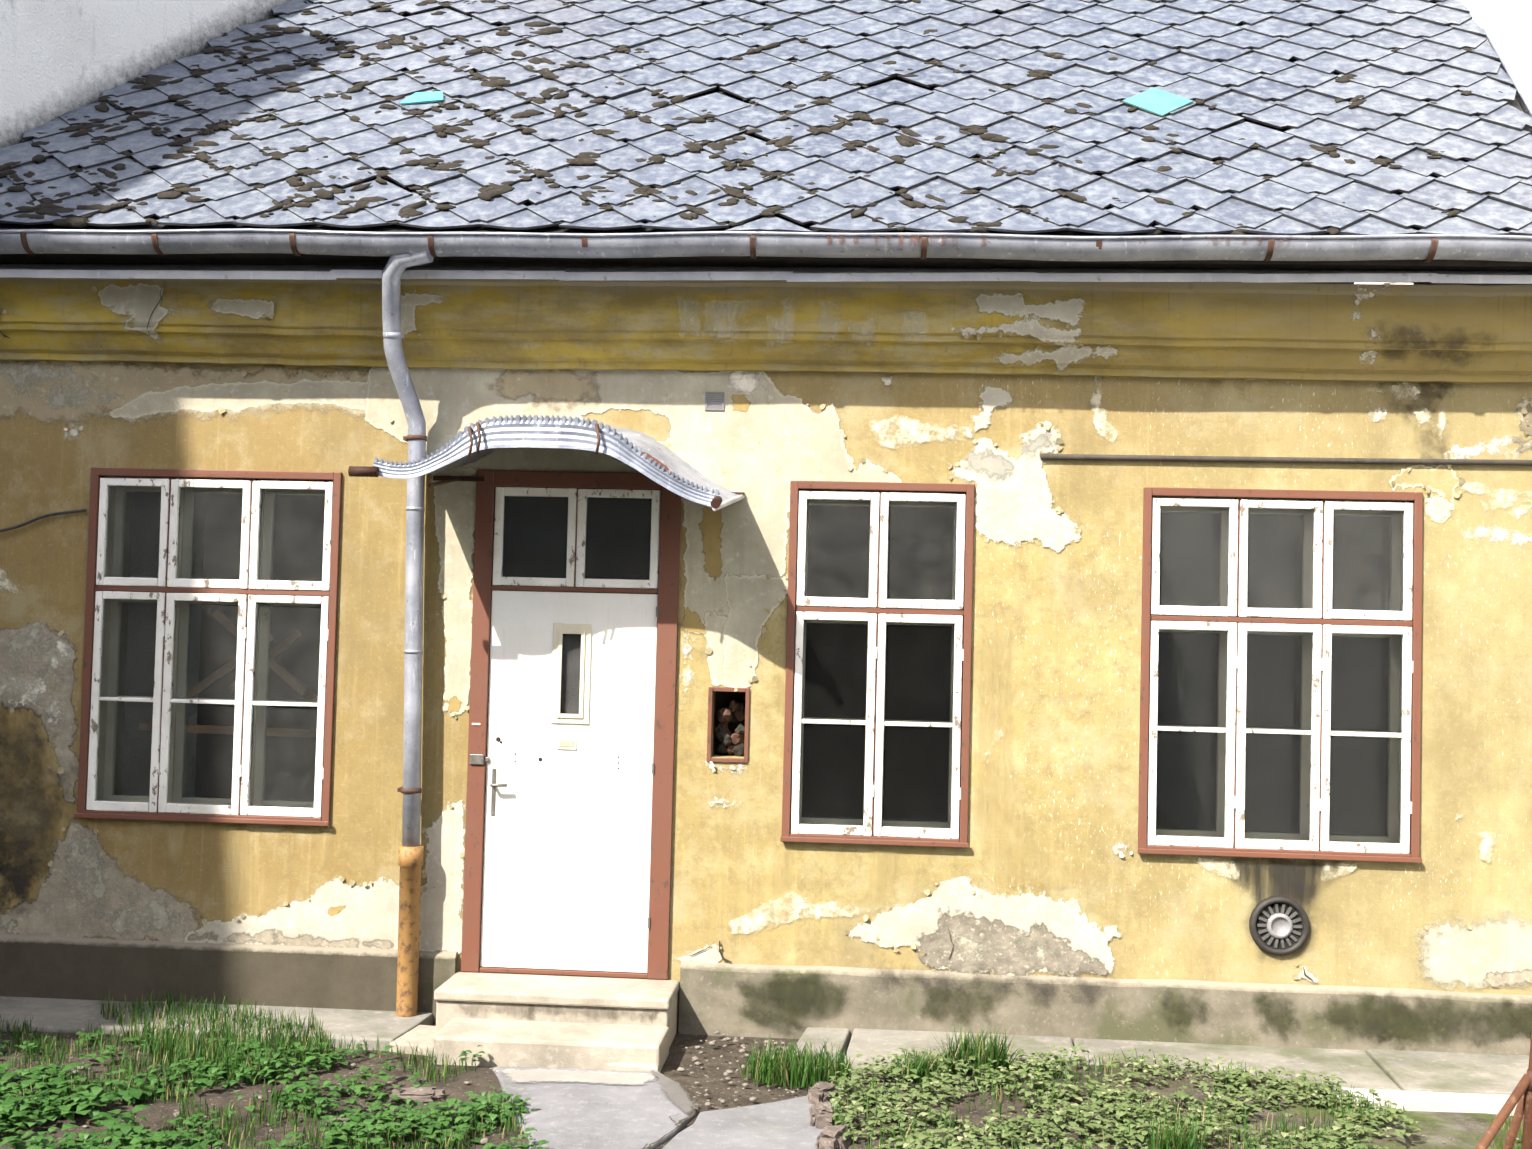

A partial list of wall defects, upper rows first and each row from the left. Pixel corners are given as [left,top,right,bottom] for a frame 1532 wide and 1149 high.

peeling [947,385,1081,552]
water stain [1405,382,1450,437]
water stain [1431,435,1519,459]
peeling [0,360,902,719]
peeling [0,621,399,949]
spalling [419,800,465,955]
spalling [844,876,1121,977]
spalling [1417,911,1532,988]
water stain [739,974,843,1032]
water stain [919,974,1053,1023]
water stain [1256,994,1292,1036]
water stain [1326,995,1532,1045]